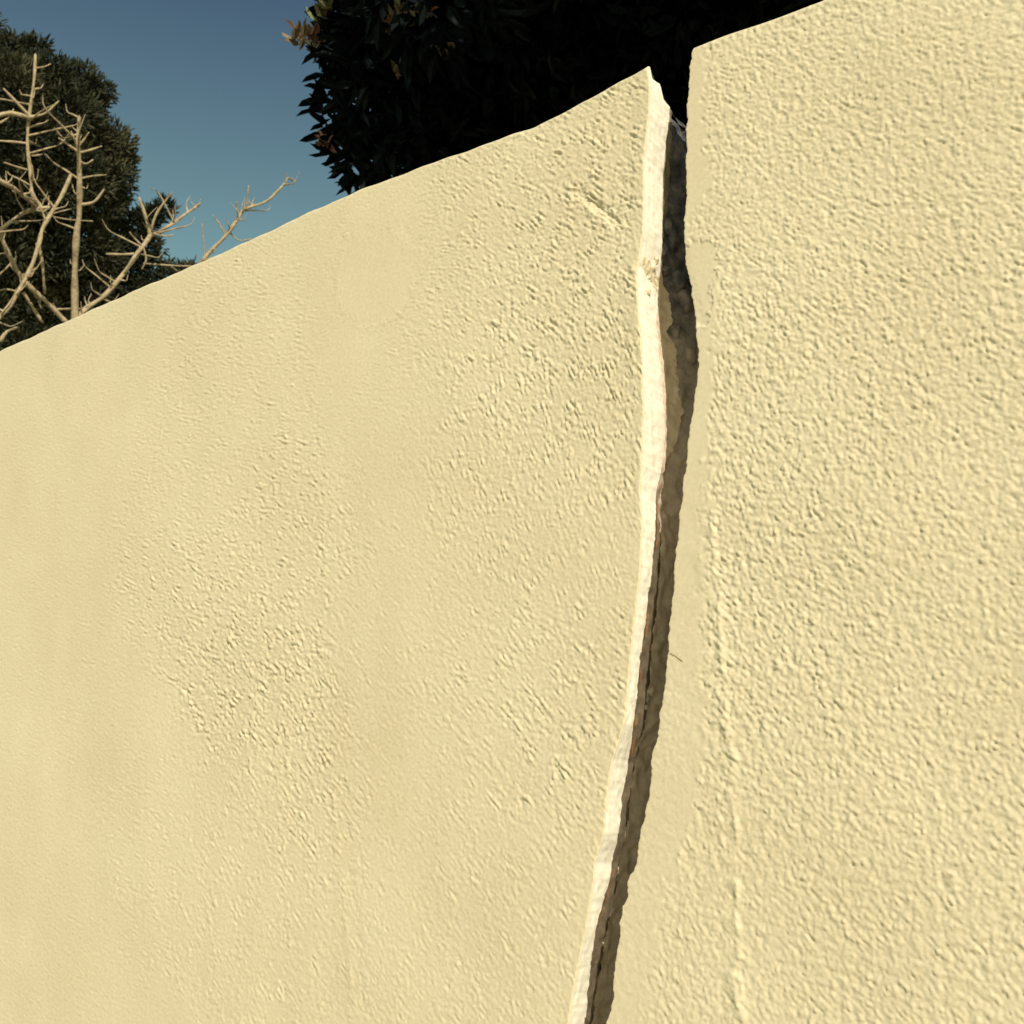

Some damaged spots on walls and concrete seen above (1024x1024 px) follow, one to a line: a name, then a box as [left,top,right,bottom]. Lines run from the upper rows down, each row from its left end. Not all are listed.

crack [570,66,699,1024]